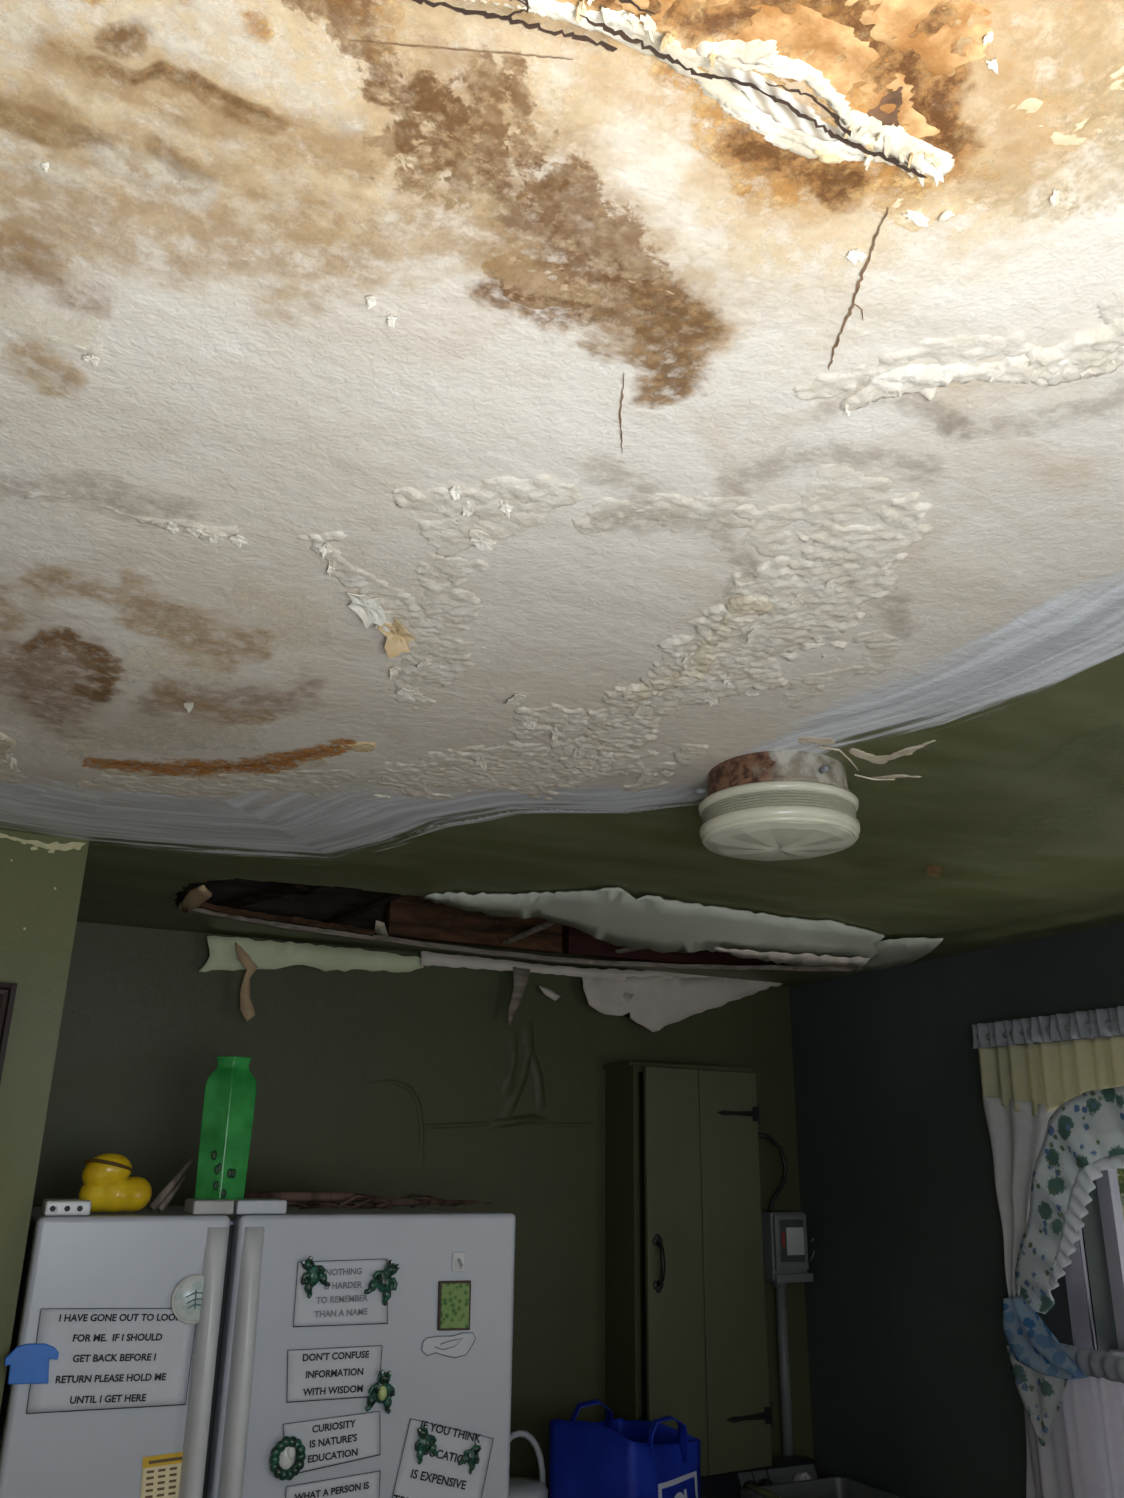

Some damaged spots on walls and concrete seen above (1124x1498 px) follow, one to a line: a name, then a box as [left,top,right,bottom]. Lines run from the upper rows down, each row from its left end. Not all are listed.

crack [350,0,955,187]
water stain [723,0,1124,263]
flaking render [983,31,998,75]
flaking render [1005,89,1110,153]
flaking render [1105,55,1124,91]
water stain [0,0,726,408]
flaking render [870,188,979,233]
crack [828,208,888,370]
flaking render [792,286,1124,416]
flaking render [24,491,247,548]
flaking render [297,463,936,801]
spalling [181,885,212,914]